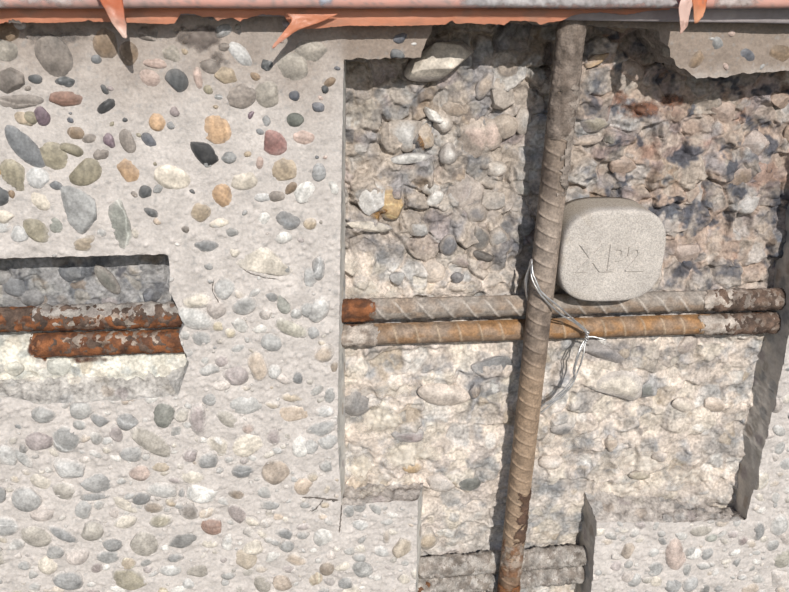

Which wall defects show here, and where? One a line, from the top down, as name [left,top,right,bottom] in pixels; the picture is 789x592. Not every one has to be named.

peeling [0,0,670,48]
peeling [678,0,707,34]
spalling [0,254,189,404]
spalling [337,20,789,592]